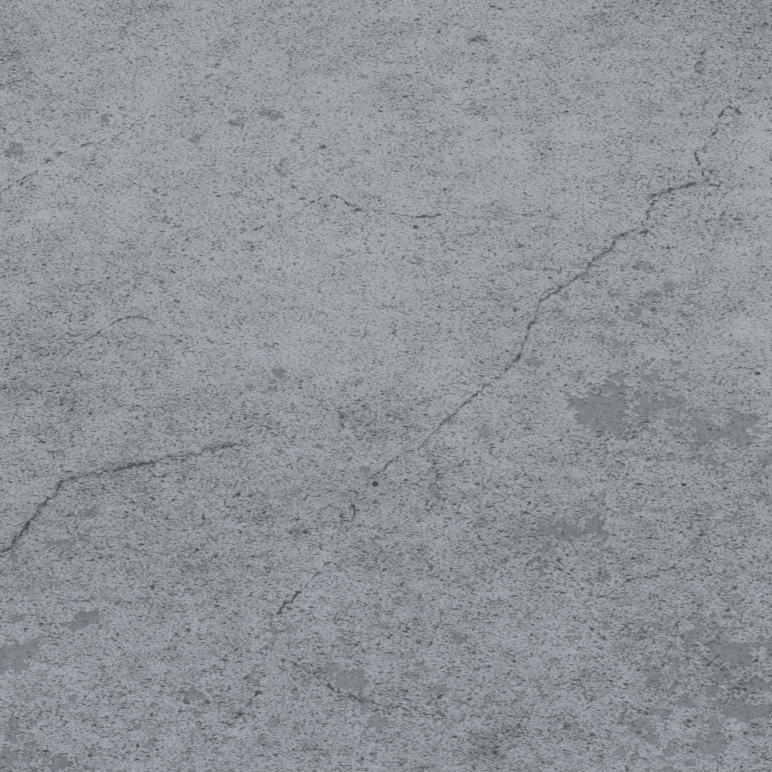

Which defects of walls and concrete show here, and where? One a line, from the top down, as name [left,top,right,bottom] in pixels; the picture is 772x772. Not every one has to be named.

crack [589,150,714,267]
crack [423,291,559,445]
peeling [564,371,761,448]
crack [2,462,154,553]
crack [277,562,330,615]